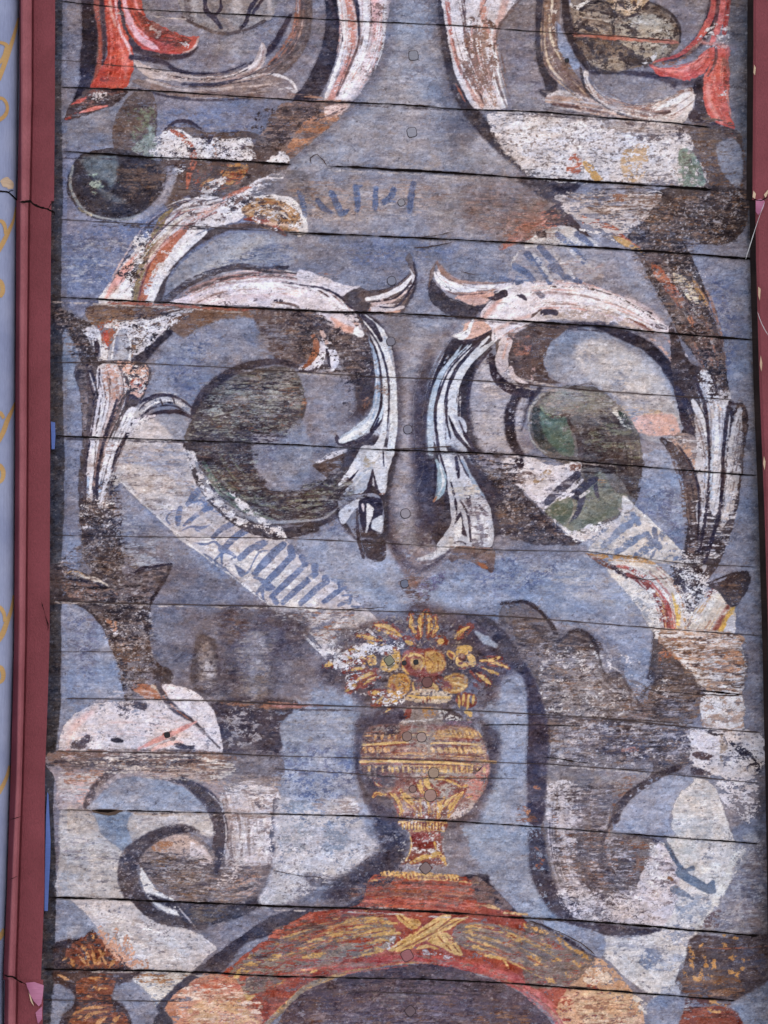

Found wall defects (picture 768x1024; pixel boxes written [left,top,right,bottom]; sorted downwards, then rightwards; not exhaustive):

crack [0,190,750,260]
peeling [635,563,765,824]
peeling [557,848,679,925]